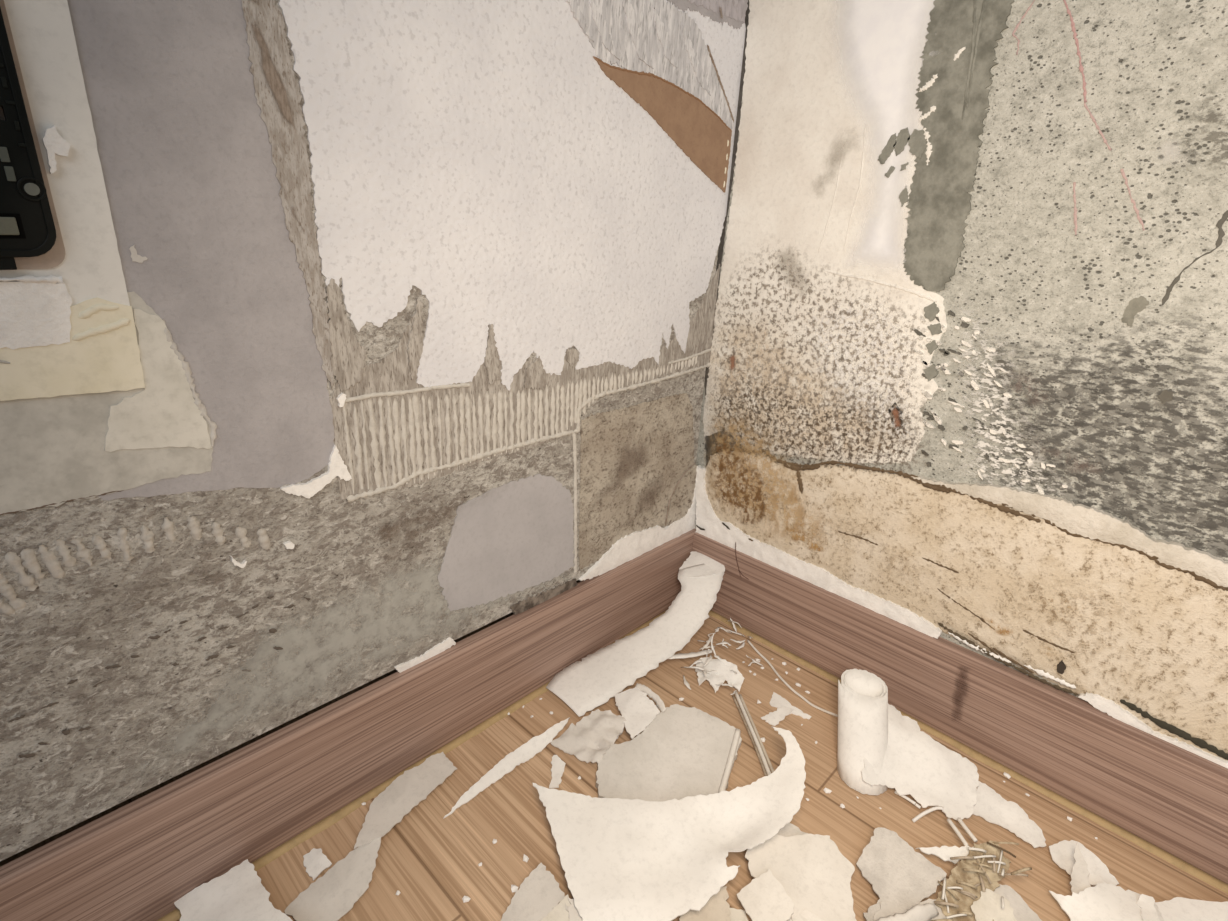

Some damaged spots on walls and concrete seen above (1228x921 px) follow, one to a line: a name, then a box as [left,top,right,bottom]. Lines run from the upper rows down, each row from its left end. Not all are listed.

peeling [278,0,746,390]
crack [1162,210,1228,305]
spalling [1121,296,1149,327]
leakage [714,256,917,468]
peeling [280,444,352,498]
spalling [438,393,698,611]
flaking render [911,310,1228,587]
leakage [964,320,1228,561]
flaking render [395,637,456,673]
leakage [1032,592,1096,633]
peeling [761,692,812,726]